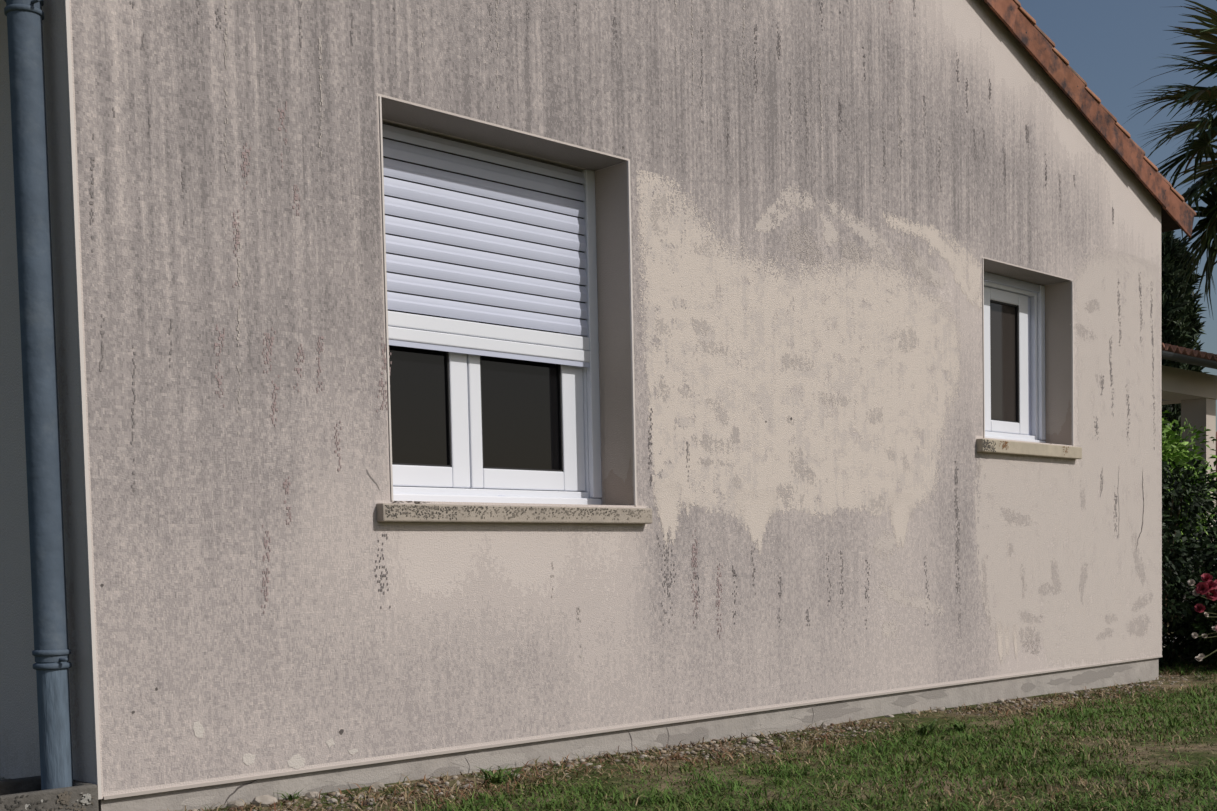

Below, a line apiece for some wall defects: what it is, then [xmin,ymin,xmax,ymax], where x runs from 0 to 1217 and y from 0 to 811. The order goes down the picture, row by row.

water stain [1101,278,1130,433]
water stain [57,338,72,542]
water stain [1046,400,1072,445]
water stain [603,458,634,505]
water stain [750,701,865,730]